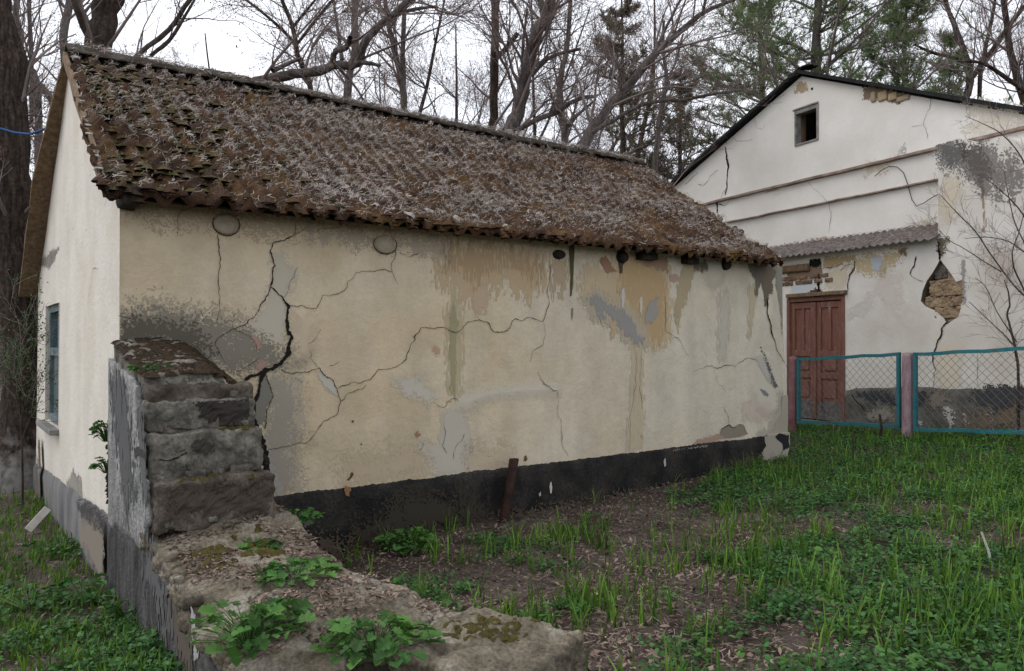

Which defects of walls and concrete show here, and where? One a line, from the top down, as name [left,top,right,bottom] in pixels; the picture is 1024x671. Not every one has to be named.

spalling [861,85,910,105]
crack [685,120,762,212]
damp [896,89,1024,232]
damp [120,285,320,527]
damp [121,202,575,404]
crack [177,205,568,470]
damp [674,260,709,334]
crack [665,299,787,433]
spalling [664,347,790,467]
spalling [755,254,856,329]
crack [932,322,947,385]
spalling [921,236,966,324]